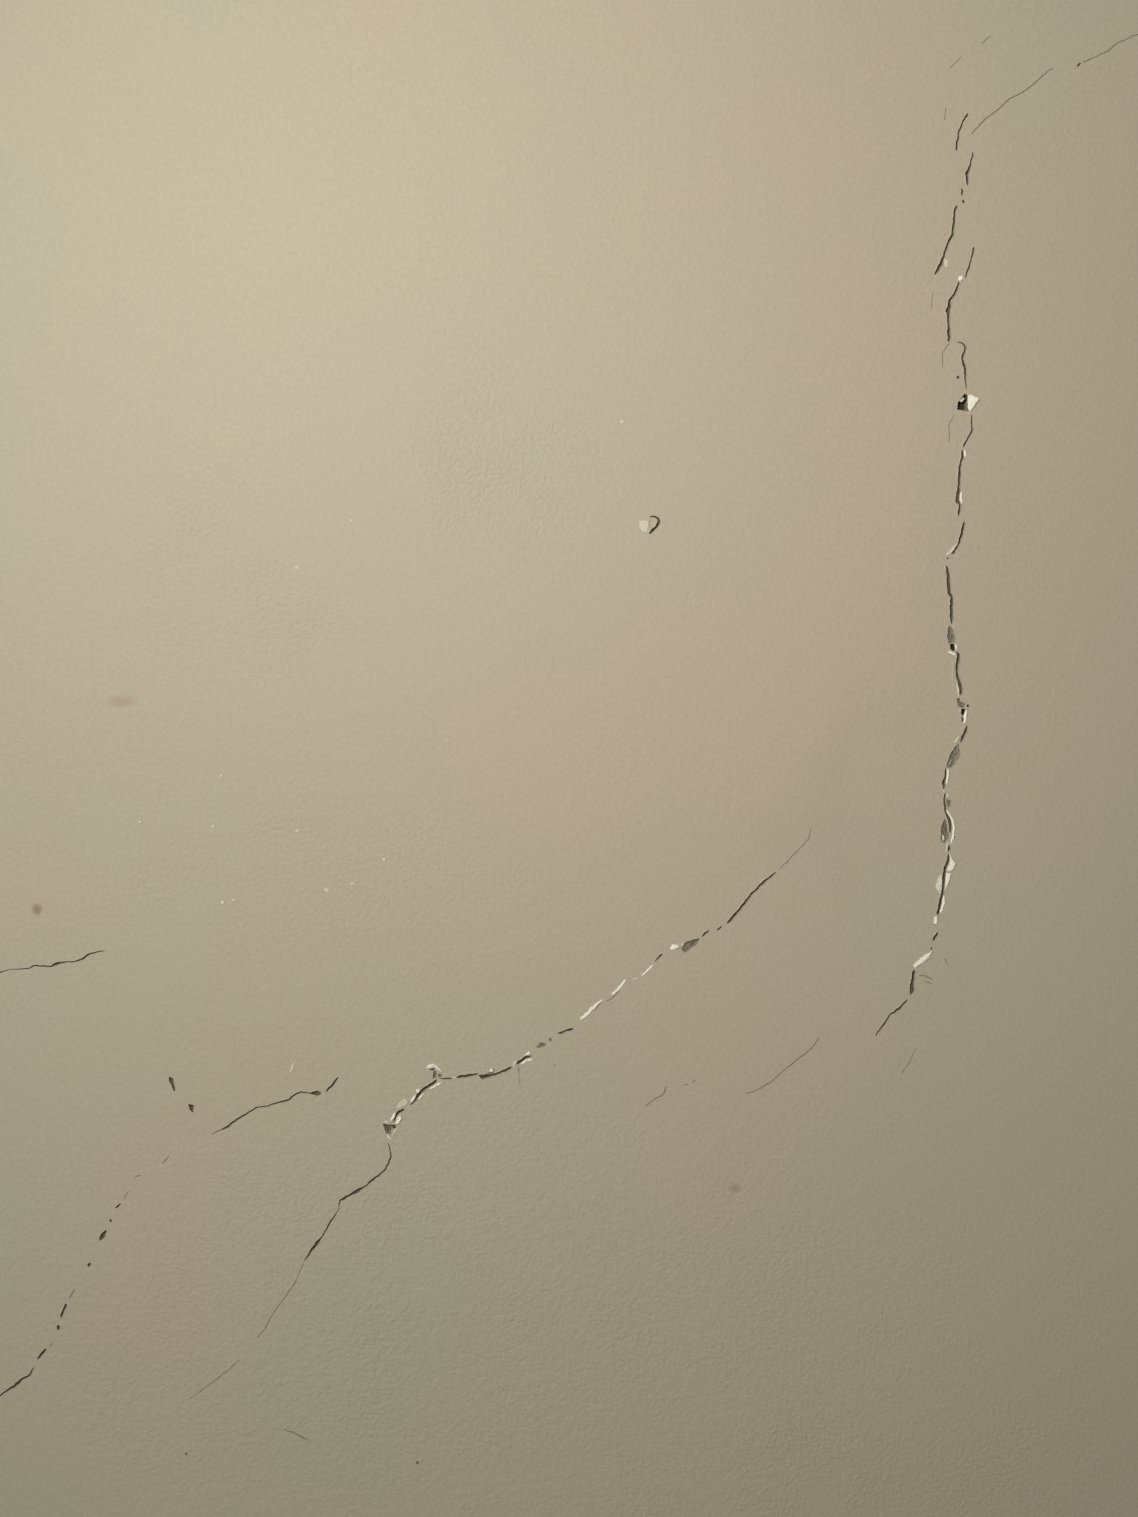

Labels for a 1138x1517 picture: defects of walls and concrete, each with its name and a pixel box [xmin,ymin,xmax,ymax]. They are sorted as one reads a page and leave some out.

crack [875,34,1138,1036]
crack [0,950,105,973]
crack [0,1156,169,1397]
crack [188,827,820,1400]